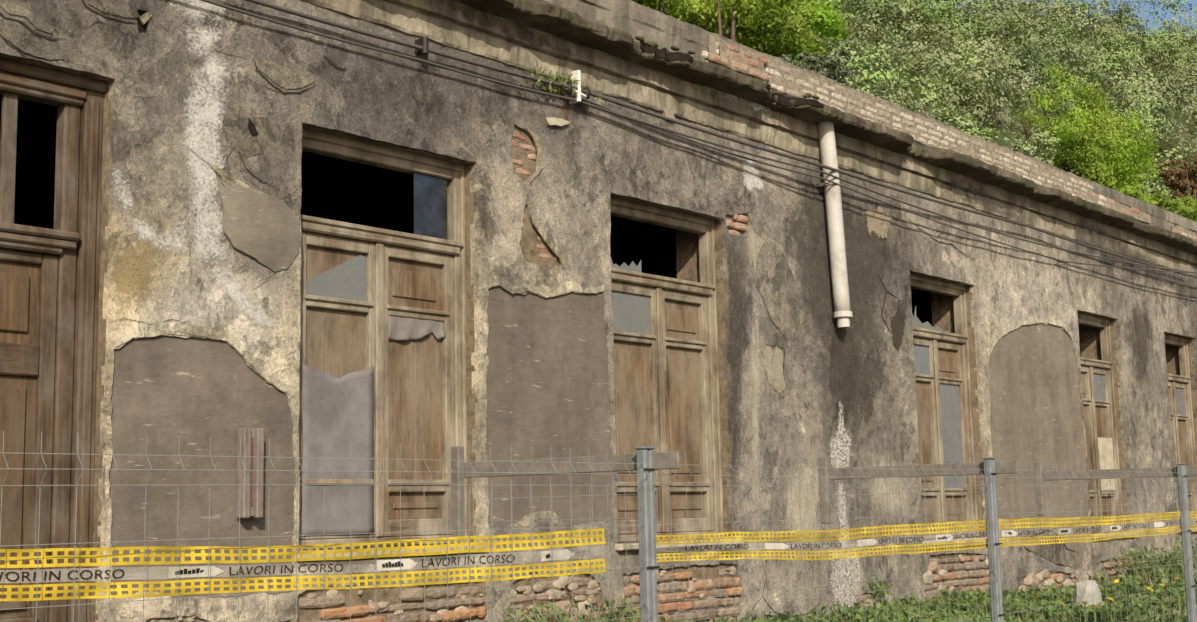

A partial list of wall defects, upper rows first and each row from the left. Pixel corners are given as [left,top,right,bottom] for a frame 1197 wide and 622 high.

crack [0,0,141,58]
spalling [511,117,570,183]
spalling [721,213,751,235]
leakage [742,157,764,191]
peeling [866,205,891,238]
spalling [635,33,1151,224]
peeling [485,201,611,461]
leakage [727,189,890,544]
peeling [103,320,487,622]
peeling [488,472,613,530]
leakage [830,483,861,609]
peeling [989,315,1090,592]